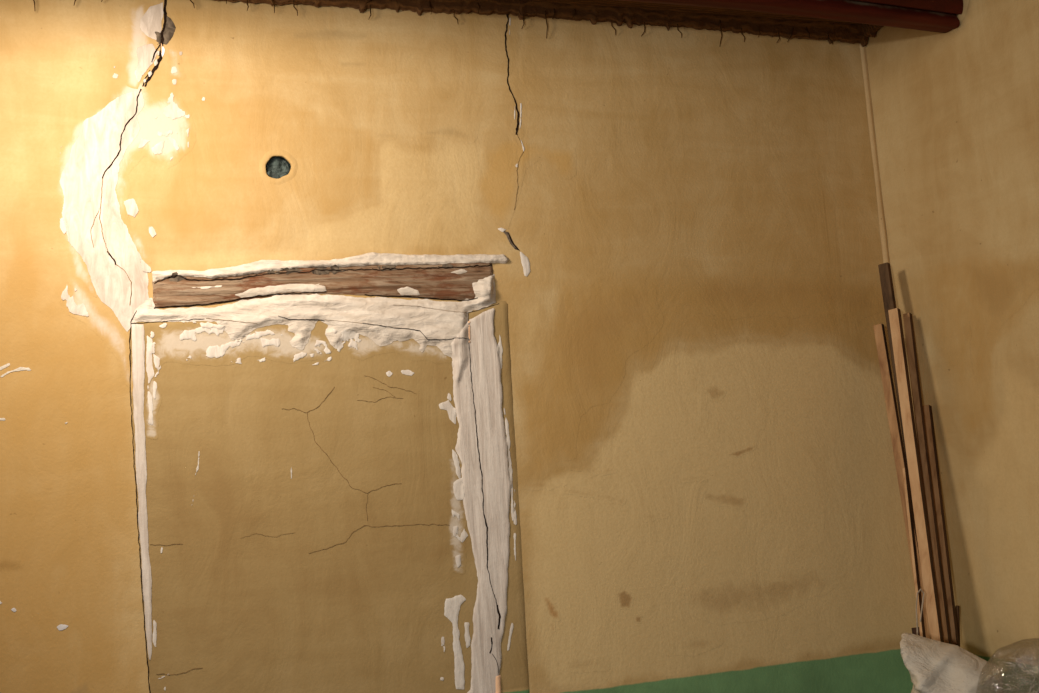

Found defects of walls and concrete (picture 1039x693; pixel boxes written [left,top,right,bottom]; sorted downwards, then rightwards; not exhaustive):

peeling [54,1,517,693]
crack [91,0,501,693]
crack [505,14,525,210]